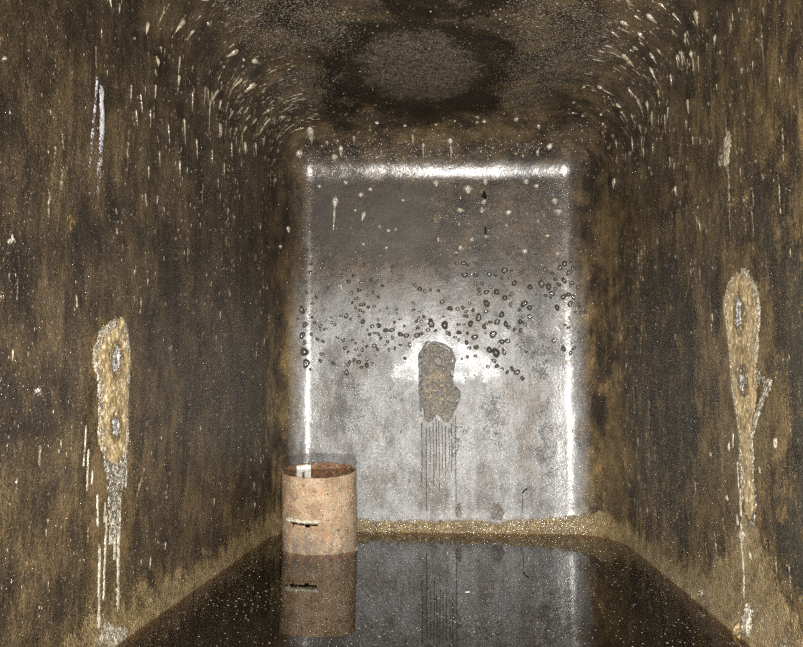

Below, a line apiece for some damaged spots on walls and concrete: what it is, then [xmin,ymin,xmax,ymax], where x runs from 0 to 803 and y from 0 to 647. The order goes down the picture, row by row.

damp [89,46,105,182]
damp [215,0,627,131]
rust [418,341,461,510]
damp [357,119,803,647]
damp [53,507,282,647]